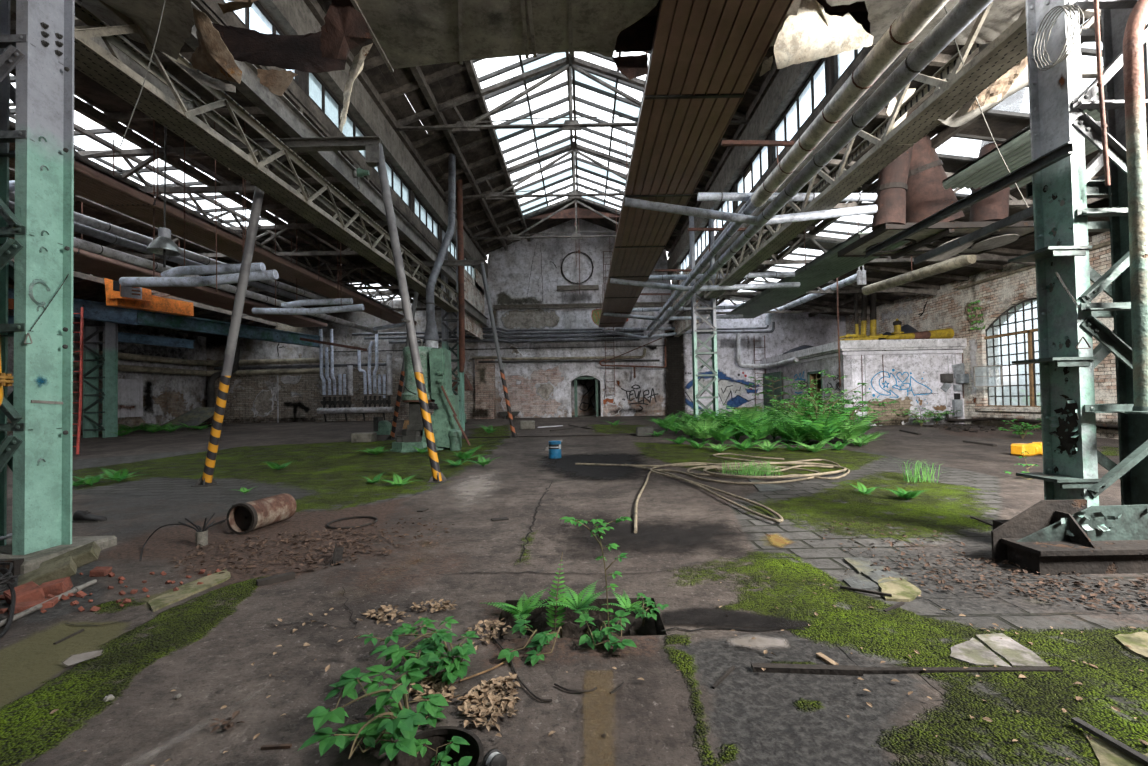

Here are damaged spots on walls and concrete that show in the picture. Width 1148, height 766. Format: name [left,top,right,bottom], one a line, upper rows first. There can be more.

peeling [1049,367,1080,475]